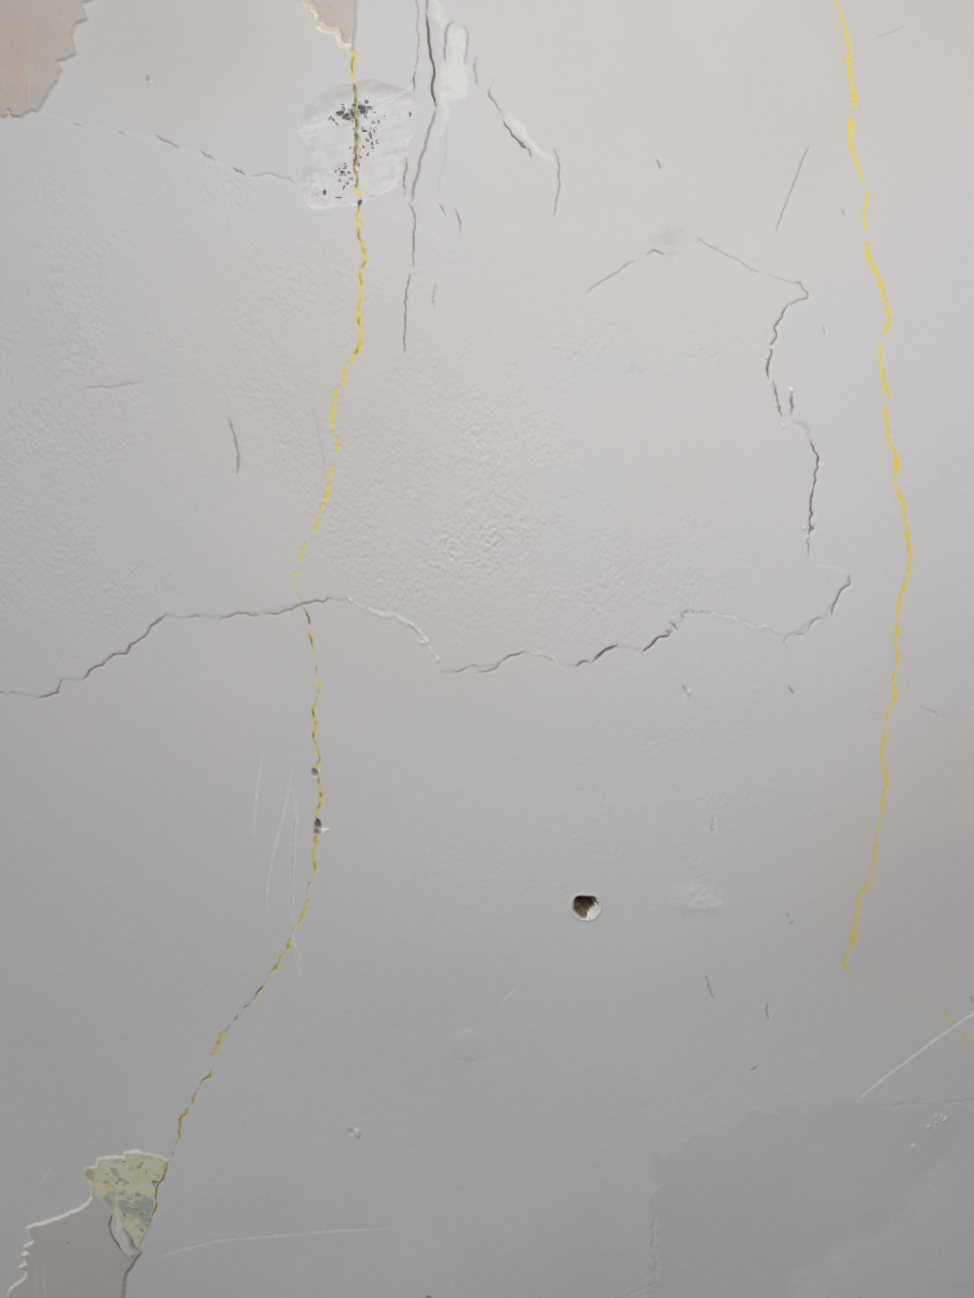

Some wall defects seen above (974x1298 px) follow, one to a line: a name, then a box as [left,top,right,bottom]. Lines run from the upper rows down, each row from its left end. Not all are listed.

peeling [0,0,95,121]
peeling [300,0,359,54]
flaking render [295,79,423,211]
crack [401,0,563,355]
crack [765,279,822,559]
crack [833,0,914,979]
crack [0,49,369,1158]
crack [453,650,526,675]
crack [574,608,706,670]
crack [782,575,853,653]
peeling [7,1148,170,1298]